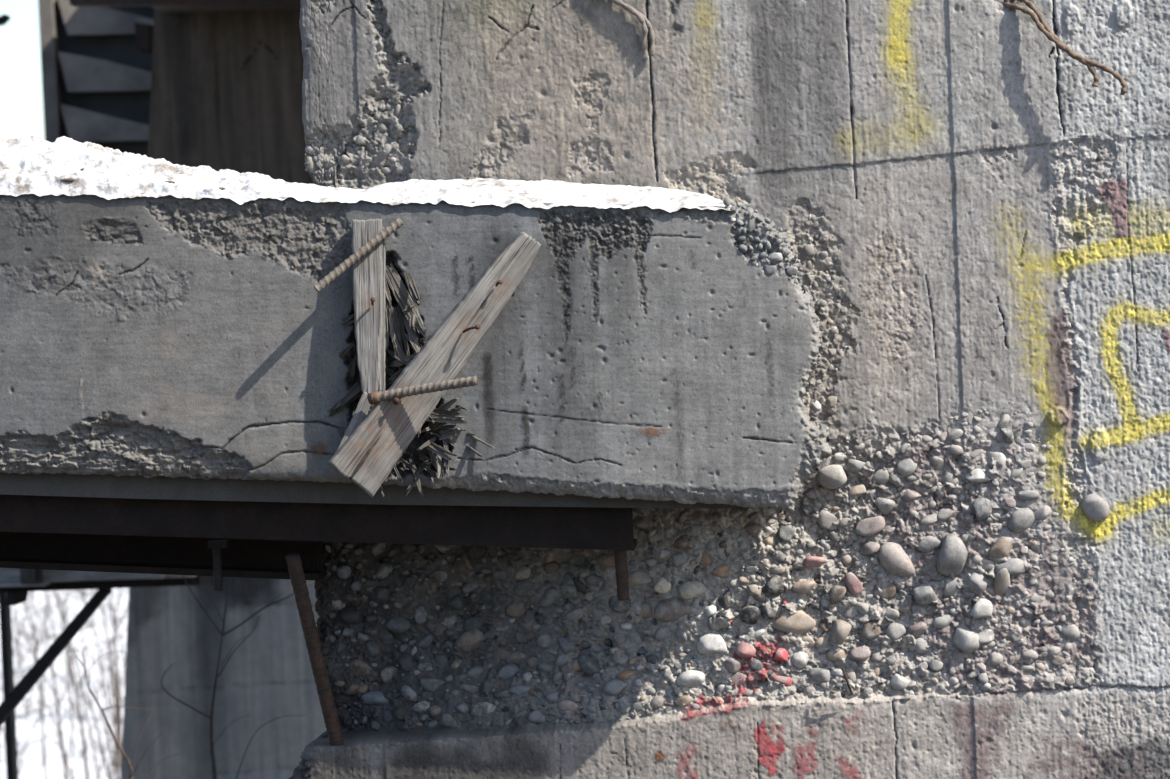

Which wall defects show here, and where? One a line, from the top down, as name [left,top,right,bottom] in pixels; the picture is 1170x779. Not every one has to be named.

spalling [304,0,432,189]
crack [1049,0,1064,135]
spalling [464,110,535,180]
spalling [144,197,353,291]
spalling [0,410,352,483]
crack [200,421,338,470]
spalling [289,136,1131,779]